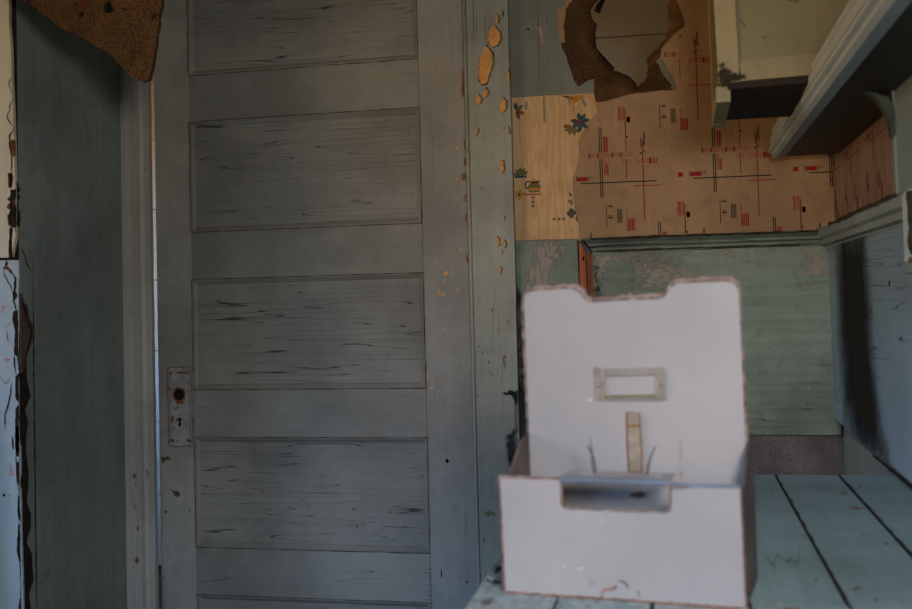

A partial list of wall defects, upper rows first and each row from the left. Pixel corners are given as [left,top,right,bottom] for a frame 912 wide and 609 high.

peeling [475,9,504,105]
spalling [557,0,684,102]
damp [517,290,527,434]
spalling [0,261,37,609]